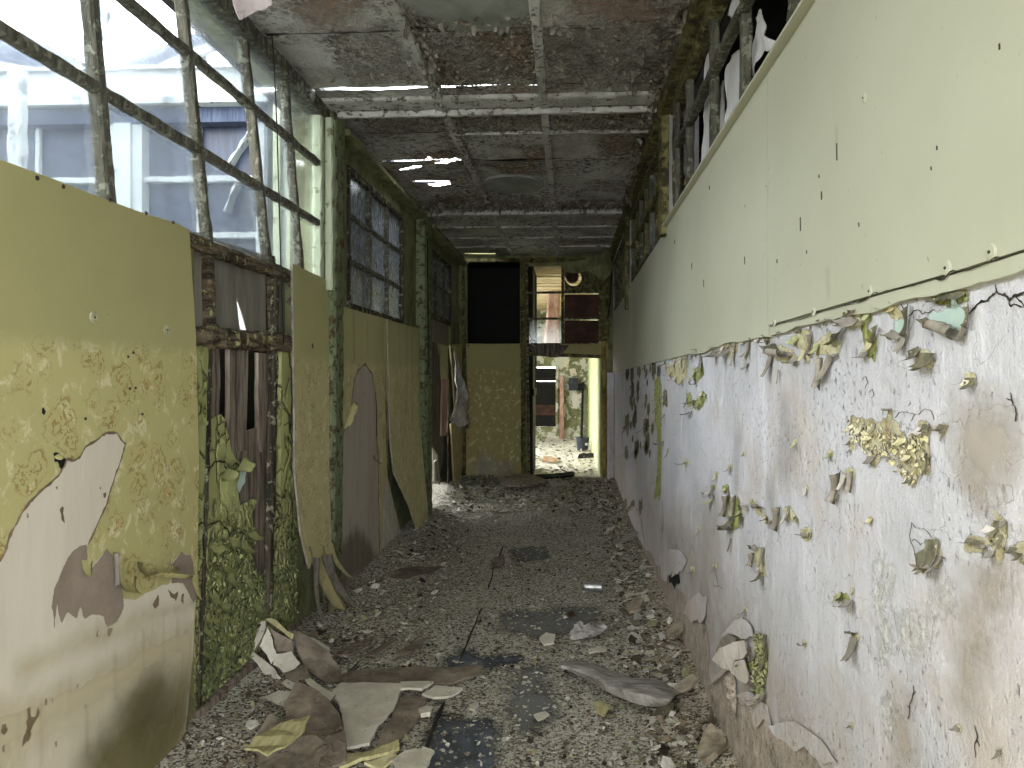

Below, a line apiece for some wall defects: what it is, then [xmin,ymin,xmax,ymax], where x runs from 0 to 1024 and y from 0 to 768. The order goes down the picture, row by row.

crack [775,250,1024,325]
peeling [959,371,976,390]
flaking render [616,289,969,768]
flaking render [959,492,1024,565]
peeling [22,699,53,747]